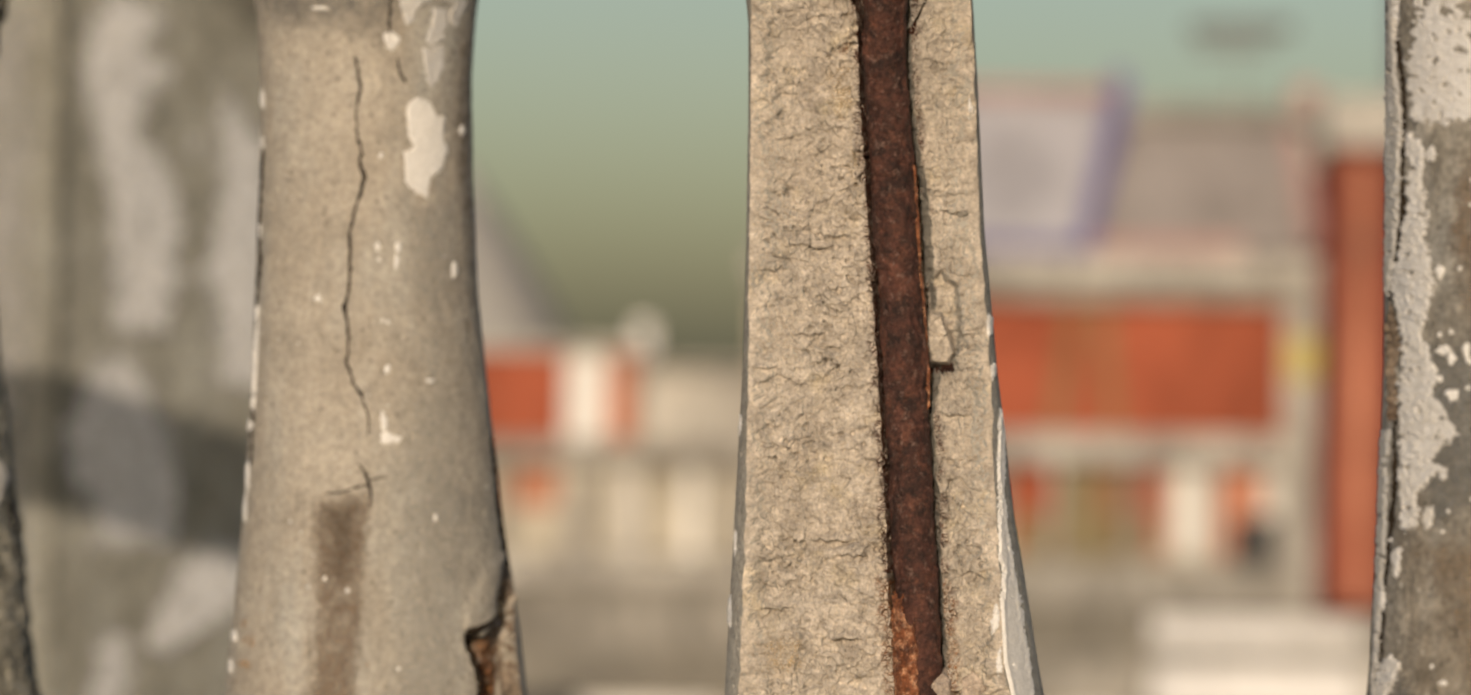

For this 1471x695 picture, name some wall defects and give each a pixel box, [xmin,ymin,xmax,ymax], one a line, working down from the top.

crack [325,56,388,508]
crack [387,0,407,83]
peeling [383,0,467,199]
spalling [727,0,895,695]
rust [840,0,895,692]
rust [907,0,936,308]
spalling [906,0,1035,695]
peeling [1369,0,1471,695]
damp [315,502,367,695]
rust [477,640,496,695]
spalling [464,560,522,695]
rust [930,362,959,694]